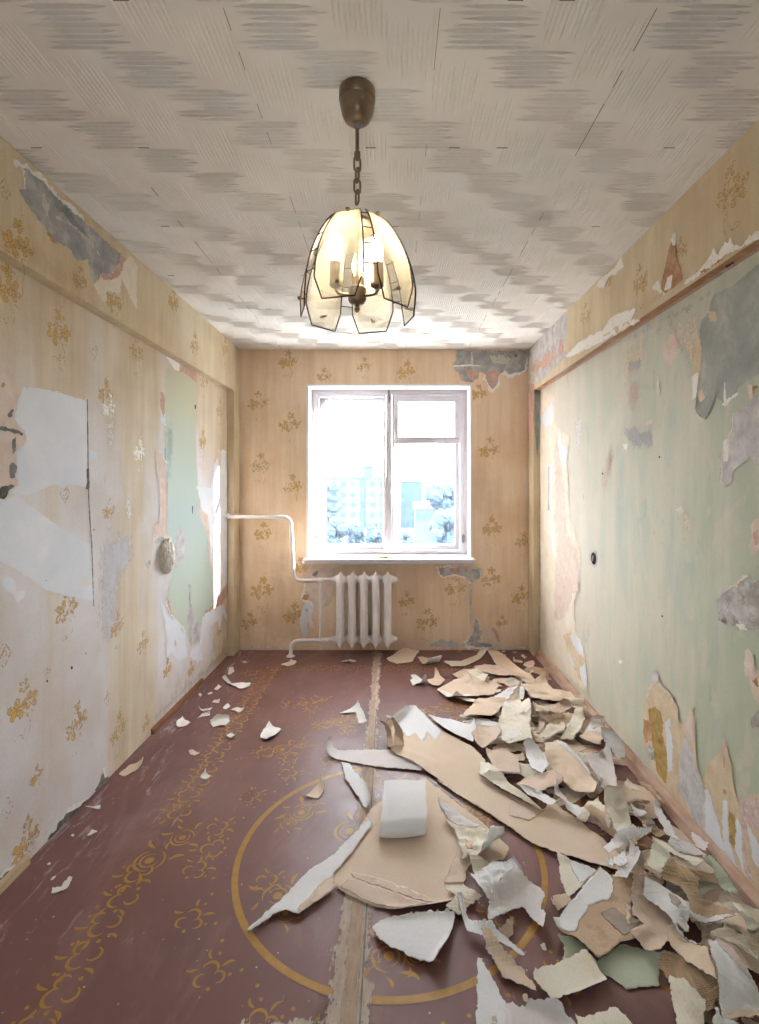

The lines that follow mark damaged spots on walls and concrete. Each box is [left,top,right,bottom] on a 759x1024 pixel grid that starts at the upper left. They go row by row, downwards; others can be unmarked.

spalling [14,159,126,283]
spalling [453,239,759,488]
spalling [0,361,26,499]
spalling [436,565,483,584]
spalling [464,615,501,650]
spalling [716,574,759,637]
peeling [744,649,759,728]
peeling [702,854,739,893]